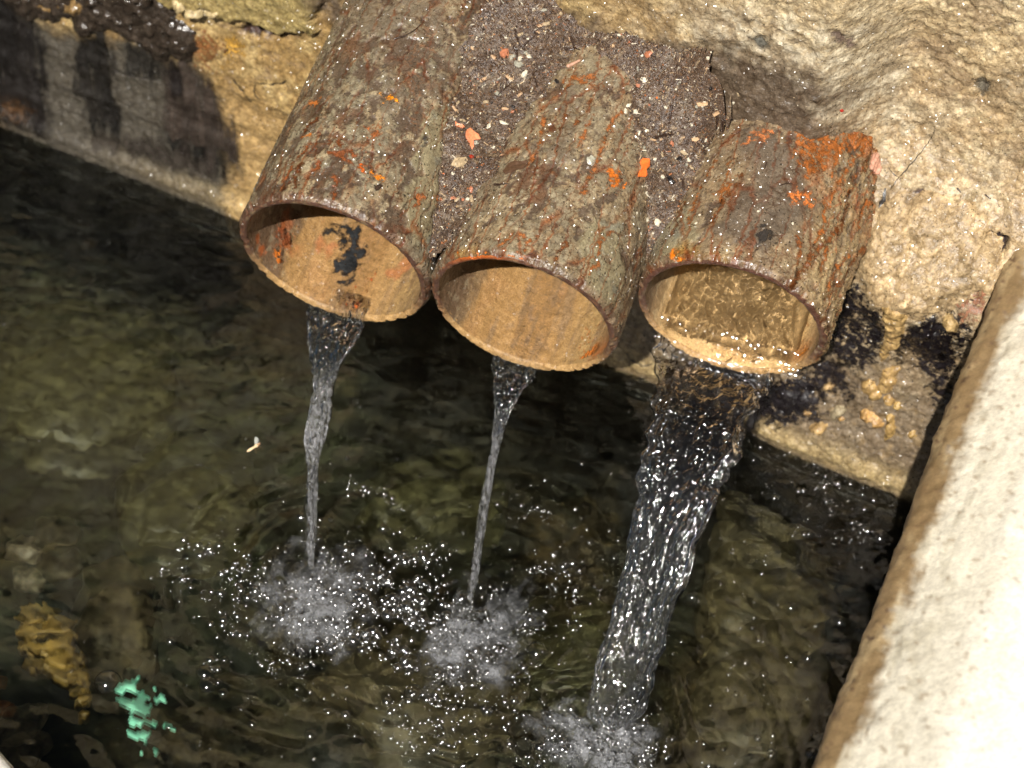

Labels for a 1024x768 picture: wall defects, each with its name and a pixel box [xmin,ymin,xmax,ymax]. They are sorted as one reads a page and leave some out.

water stain [0,0,49,138]
water stain [73,31,243,180]
corrosion [280,100,385,197]
corrosion [558,65,604,148]
corrosion [579,109,629,195]
corrosion [736,129,774,146]
corrosion [588,230,614,275]
corrosion [670,159,743,262]
corrosion [785,131,878,300]
water stain [663,277,976,435]